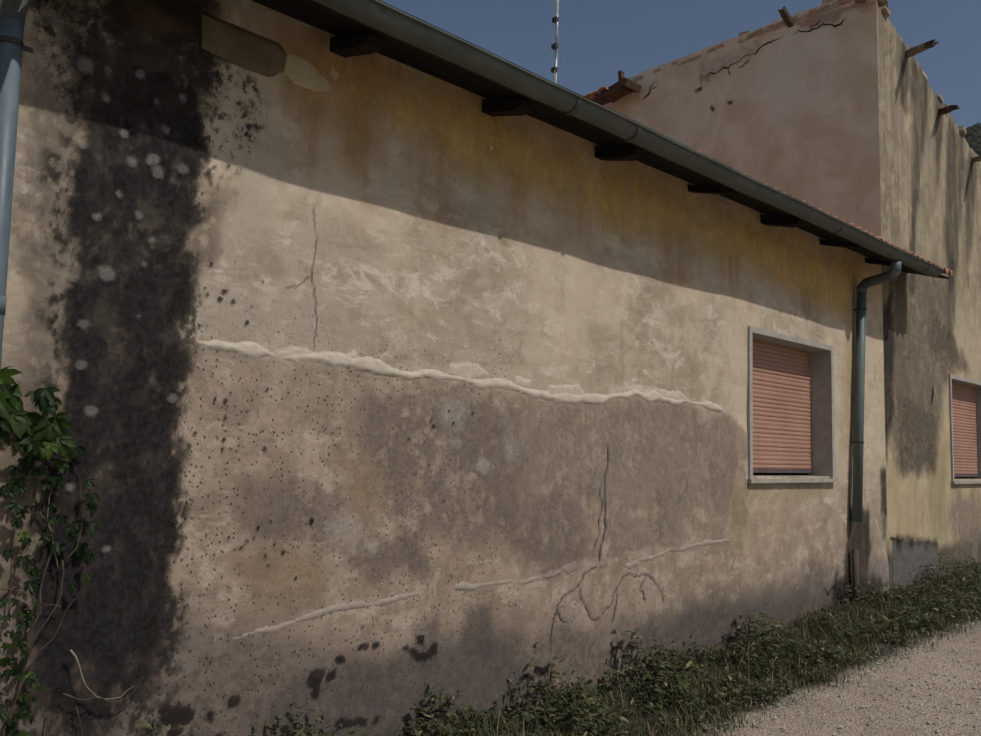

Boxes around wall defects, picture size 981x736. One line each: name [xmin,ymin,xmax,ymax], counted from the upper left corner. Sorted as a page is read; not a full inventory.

flaking render [284,52,341,93]
crack [708,18,845,77]
crack [288,207,318,351]
water stain [883,45,975,469]
water stain [2,0,265,736]
water stain [361,400,738,567]
crack [551,442,666,652]
water stain [833,509,882,606]